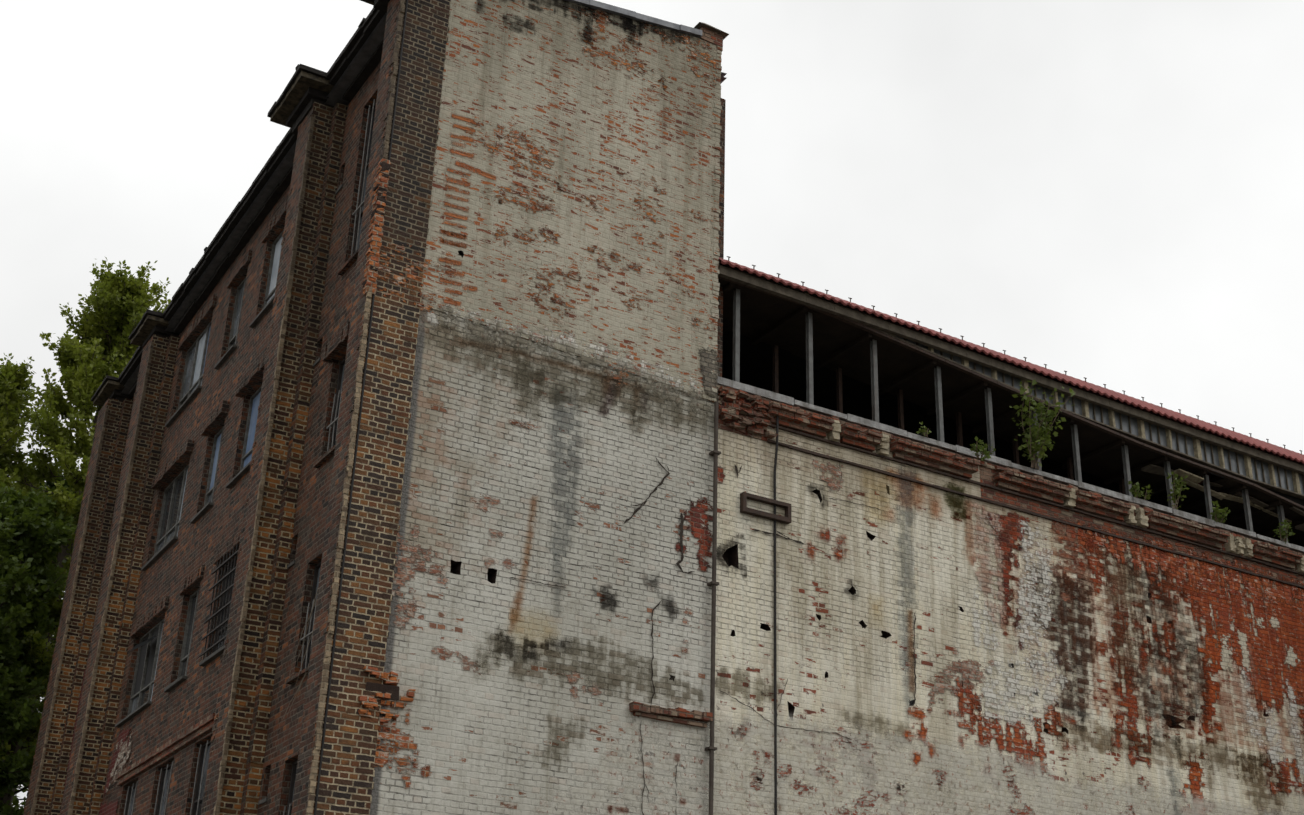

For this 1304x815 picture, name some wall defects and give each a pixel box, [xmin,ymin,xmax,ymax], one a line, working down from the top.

peeling [579,9,721,98]
spalling [362,114,643,339]
crack [624,456,670,524]
crack [676,512,694,574]
spalling [676,497,747,577]
peeling [982,508,1053,668]
peeling [106,734,132,793]
spalling [358,666,432,789]
crack [640,601,678,815]
peeling [830,733,907,815]
peeling [904,651,1075,815]
peeling [1049,517,1304,815]